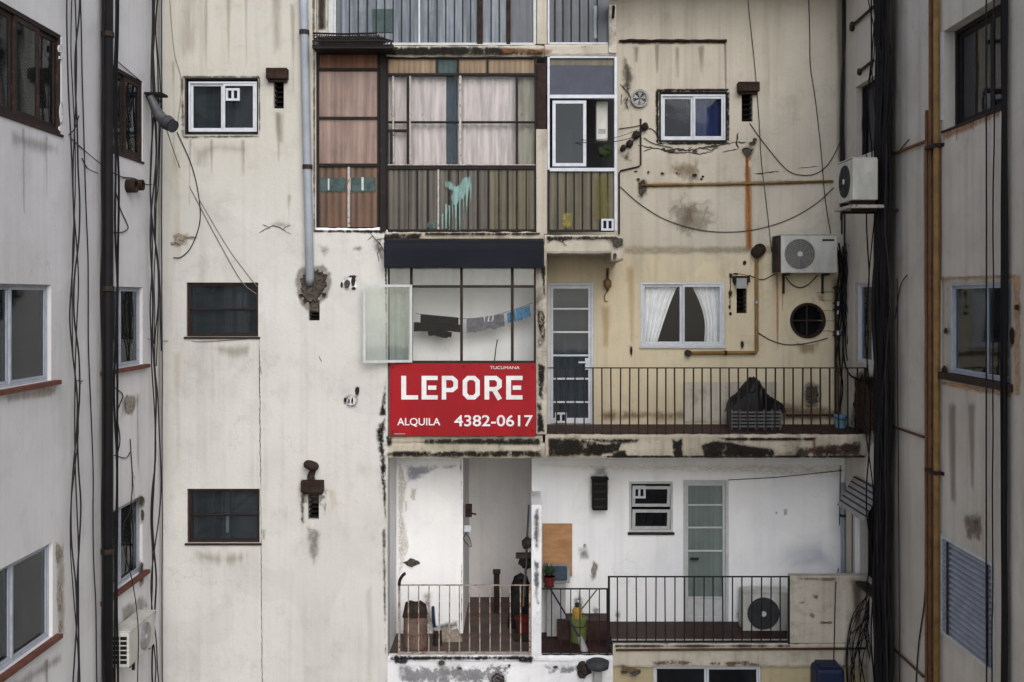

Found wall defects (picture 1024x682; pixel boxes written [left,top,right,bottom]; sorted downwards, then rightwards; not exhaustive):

damp [675,166,696,178]
spalling [297,266,357,311]